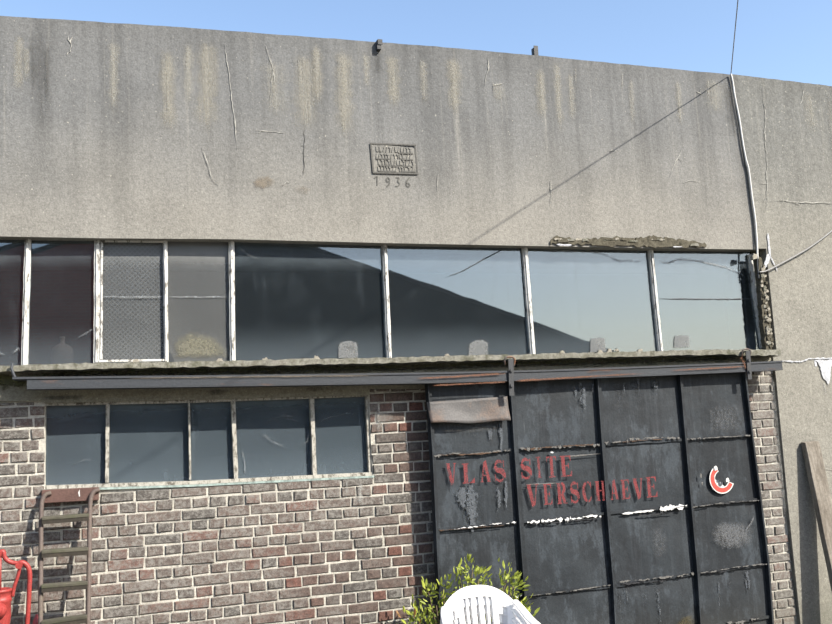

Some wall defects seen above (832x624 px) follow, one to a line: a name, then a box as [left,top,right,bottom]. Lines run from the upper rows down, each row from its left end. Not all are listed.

crack [225,51,237,141]
spalling [550,235,707,248]
peeling [750,234,778,348]
peeling [527,515,602,524]